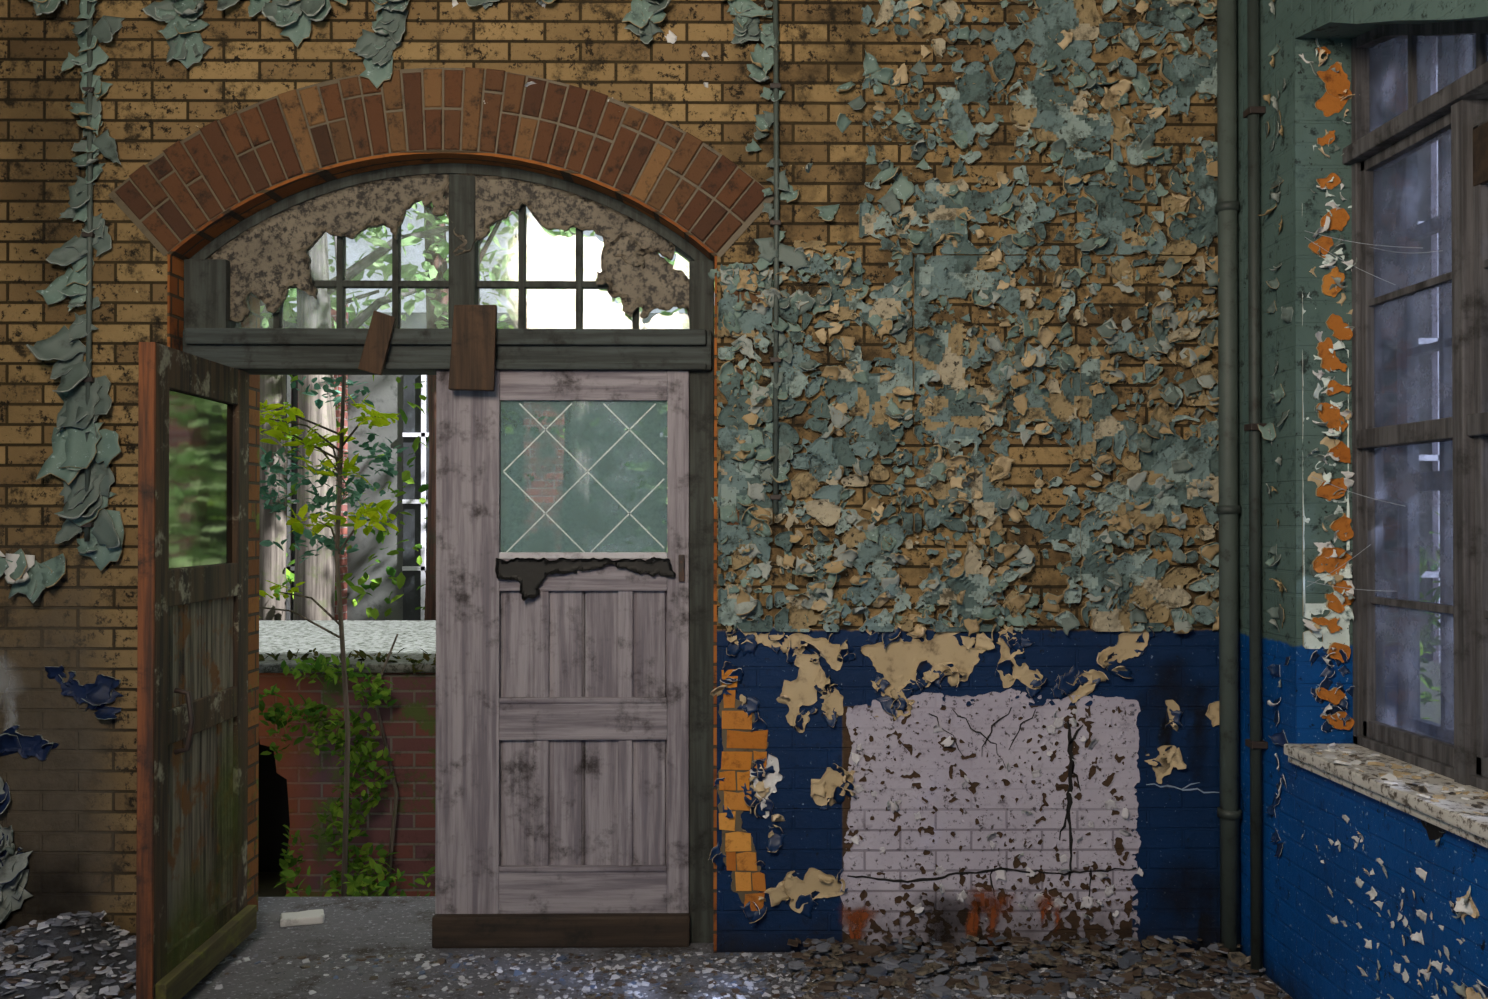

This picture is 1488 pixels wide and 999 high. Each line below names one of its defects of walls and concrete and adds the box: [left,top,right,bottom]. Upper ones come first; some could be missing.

peeling [142,0,348,69]
peeling [348,0,410,89]
peeling [0,0,125,603]
peeling [708,0,1220,924]
peeling [1258,38,1357,857]
peeling [45,665,124,720]
peeling [1301,815,1488,999]